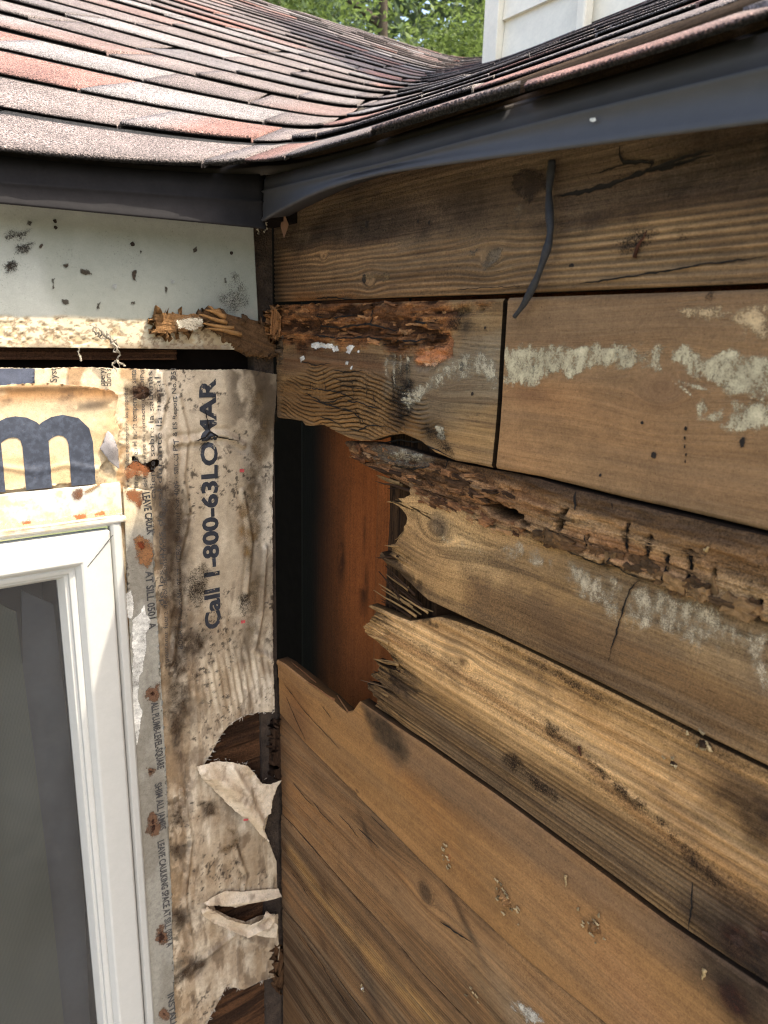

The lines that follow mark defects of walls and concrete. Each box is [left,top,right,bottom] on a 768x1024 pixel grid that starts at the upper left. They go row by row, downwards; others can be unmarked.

crack [559,145,714,197]
damp [5,221,43,273]
peeling [177,318,203,330]
peeling [281,300,398,369]
peeling [390,304,445,367]
damp [240,390,269,558]
peeling [356,443,763,623]
damp [169,500,208,735]
damp [240,580,257,616]
crack [568,503,693,661]